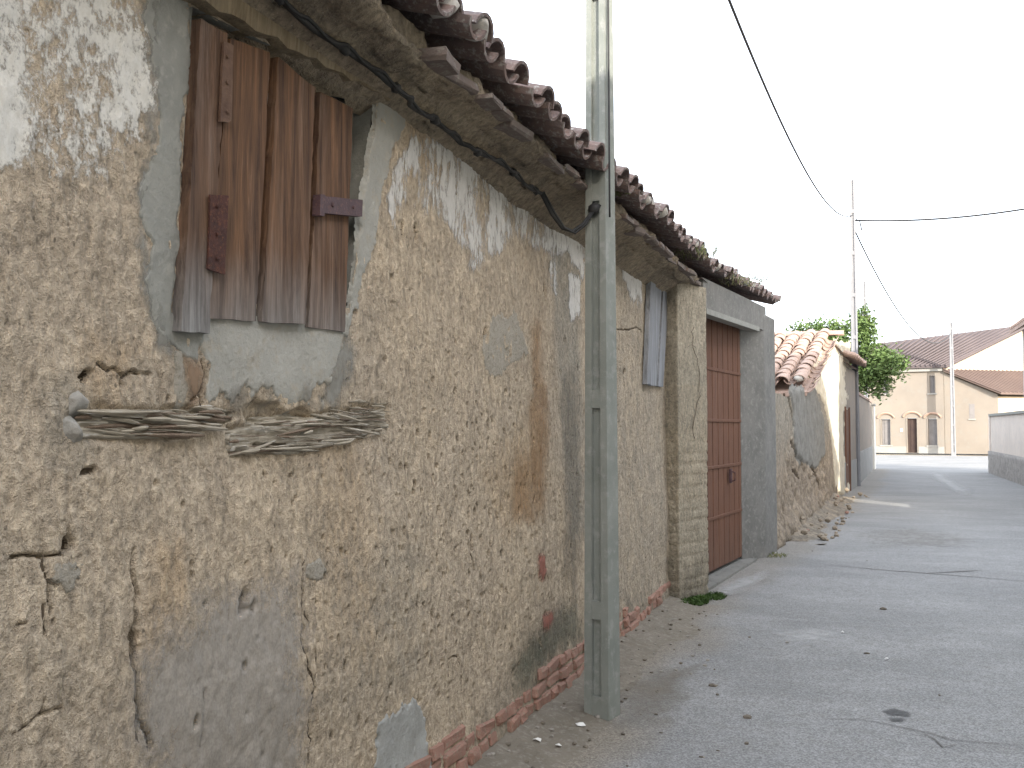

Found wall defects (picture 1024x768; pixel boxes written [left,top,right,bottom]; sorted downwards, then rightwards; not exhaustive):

peeling [0,0,158,178]
peeling [386,135,585,321]
crack [96,362,137,379]
crack [688,327,700,439]
crack [9,553,59,636]
crack [128,640,148,749]
crack [300,560,317,760]